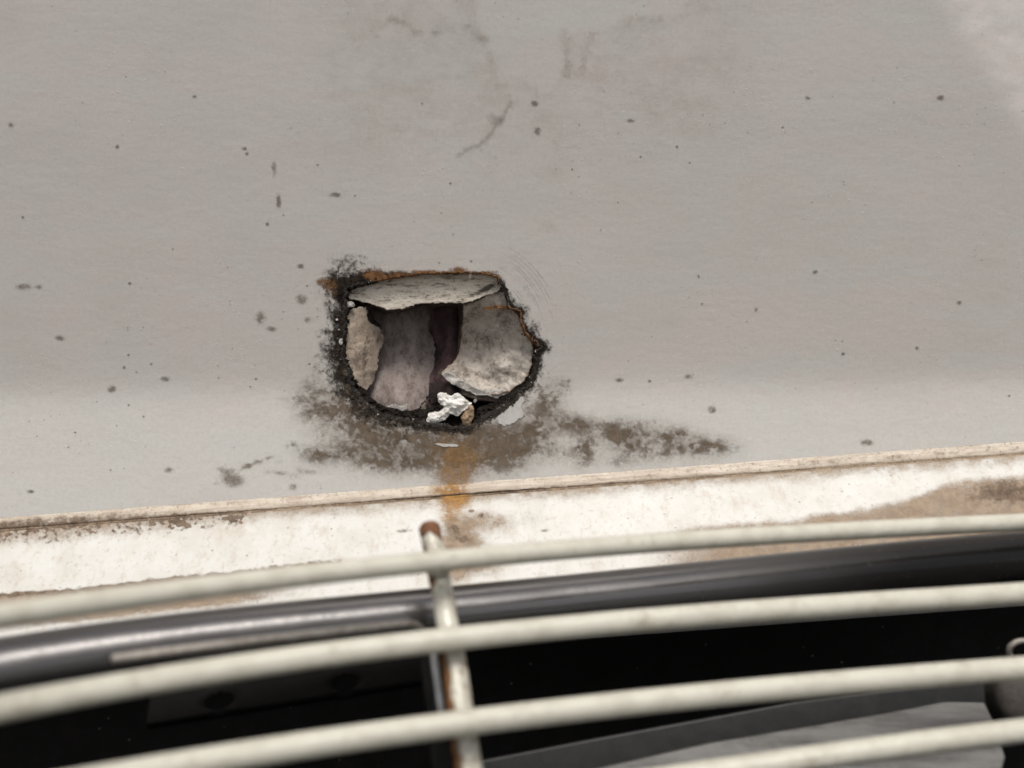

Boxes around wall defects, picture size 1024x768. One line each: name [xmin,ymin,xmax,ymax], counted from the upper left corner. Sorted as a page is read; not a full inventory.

corrosion [363,270,438,281]
leakage [312,371,593,470]
peeling [497,397,525,426]
leakage [603,423,725,455]
corrosion [436,445,477,517]